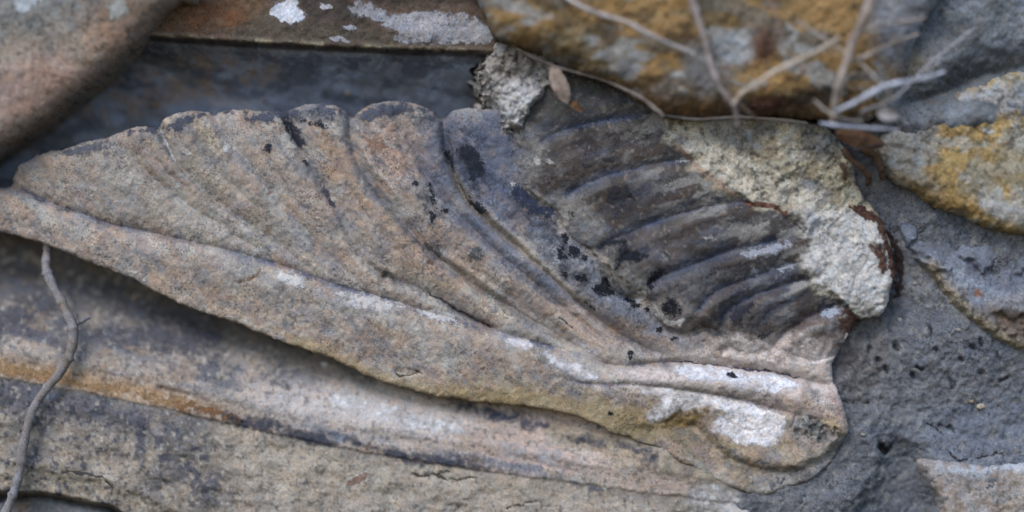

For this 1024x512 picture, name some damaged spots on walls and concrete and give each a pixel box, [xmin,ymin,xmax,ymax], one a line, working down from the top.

corrosion [849,205,905,298]